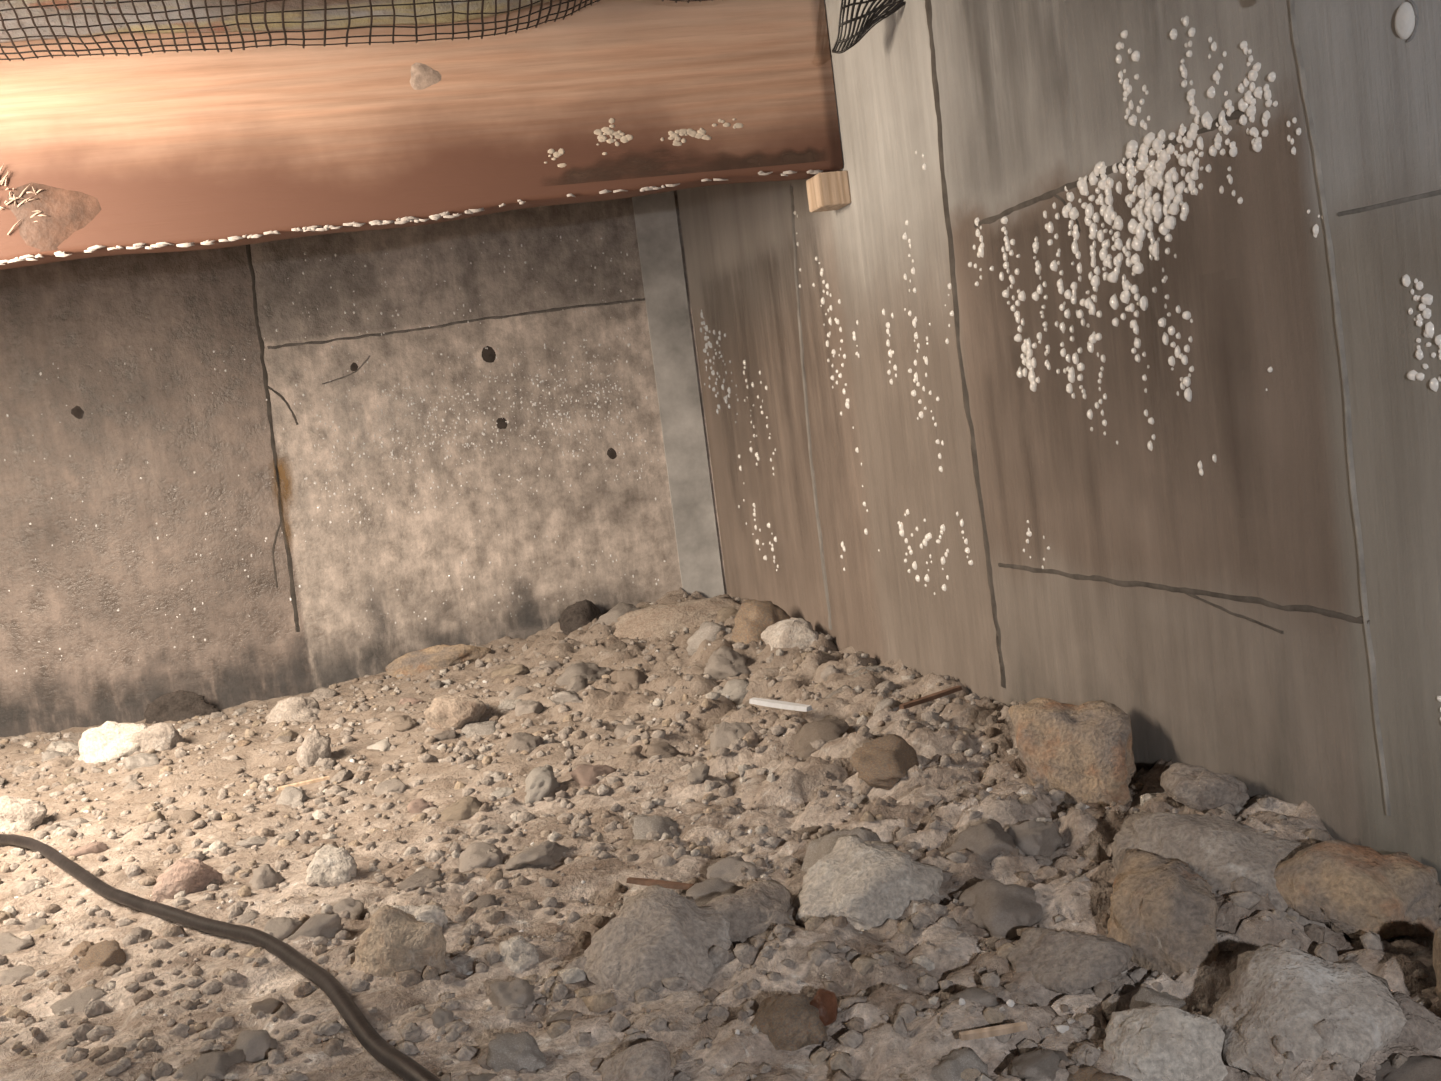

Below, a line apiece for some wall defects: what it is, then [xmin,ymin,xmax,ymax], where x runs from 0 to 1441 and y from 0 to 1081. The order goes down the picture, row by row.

water stain [561,149,821,185]
water stain [968,15,1278,451]
water stain [1286,117,1301,155]
water stain [799,256,860,429]
water stain [882,220,944,472]
water stain [1402,274,1441,392]
water stain [700,309,779,571]
water stain [897,509,973,595]